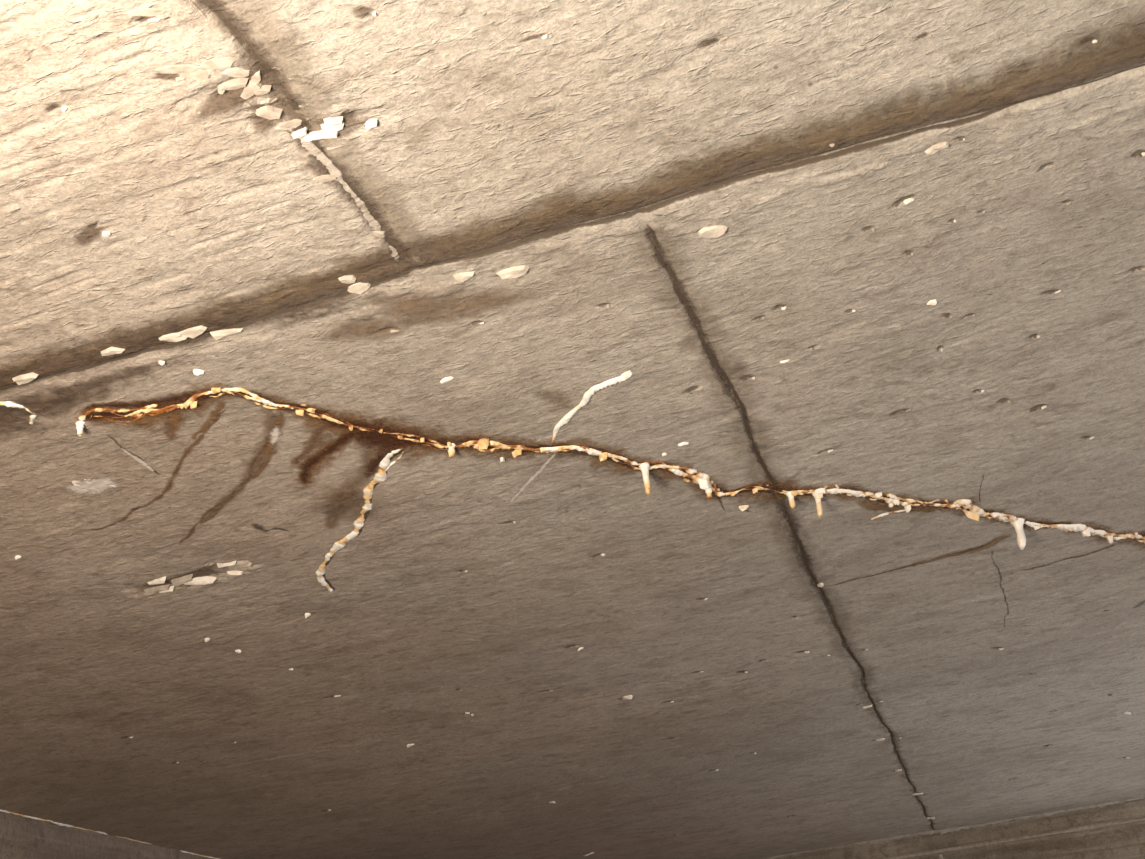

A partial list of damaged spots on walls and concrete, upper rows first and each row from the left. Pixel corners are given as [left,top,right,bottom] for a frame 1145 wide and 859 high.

spalling [154,57,378,157]
crack [0,401,37,425]
crack [75,370,1145,628]
spalling [144,560,252,593]